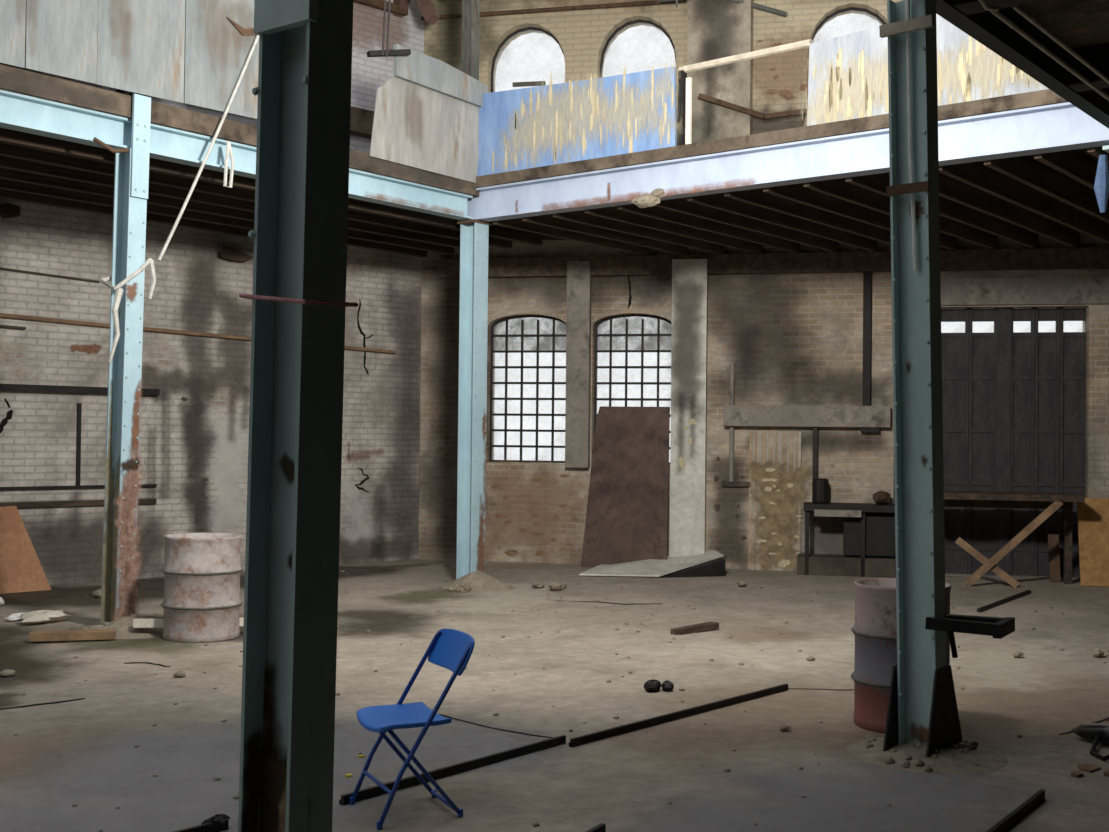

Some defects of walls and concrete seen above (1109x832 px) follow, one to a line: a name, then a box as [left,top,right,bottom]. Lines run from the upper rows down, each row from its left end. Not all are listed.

peeling [492,65,674,173]
peeling [766,46,889,125]
peeling [937,36,1037,106]
damp [143,368,196,399]
damp [218,297,252,402]
rust [101,384,143,624]
peeling [714,457,811,571]